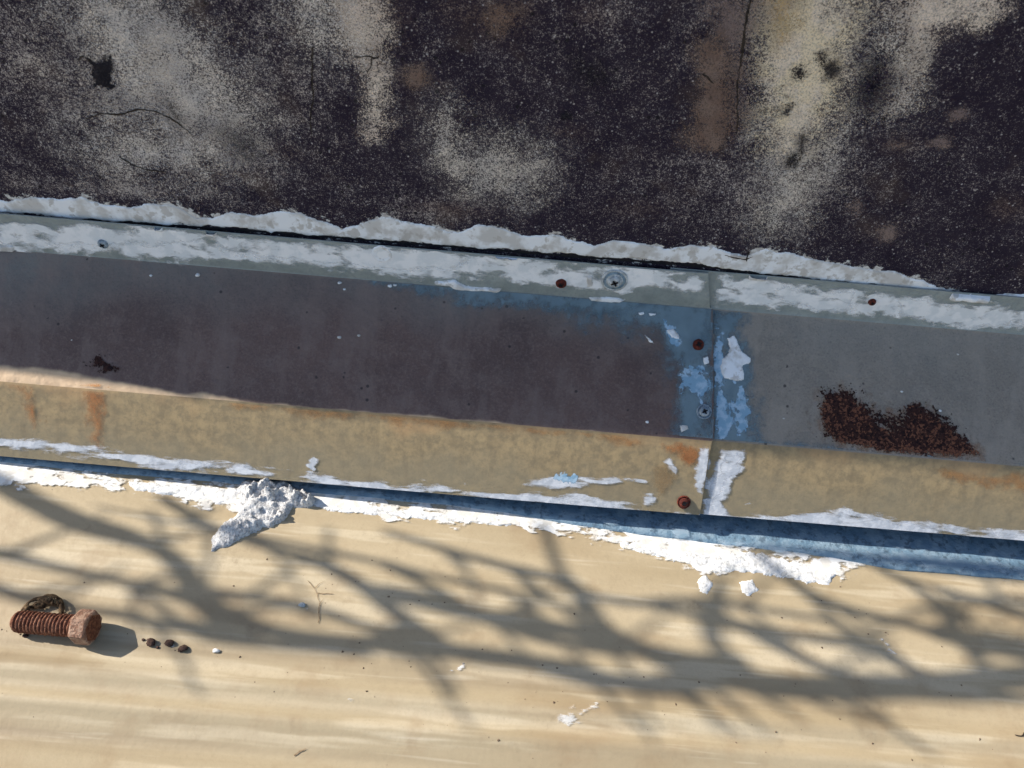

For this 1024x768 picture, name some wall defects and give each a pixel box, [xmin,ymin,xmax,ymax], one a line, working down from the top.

crack [86,109,192,136]
rust [85,354,119,439]
rust [816,383,980,458]